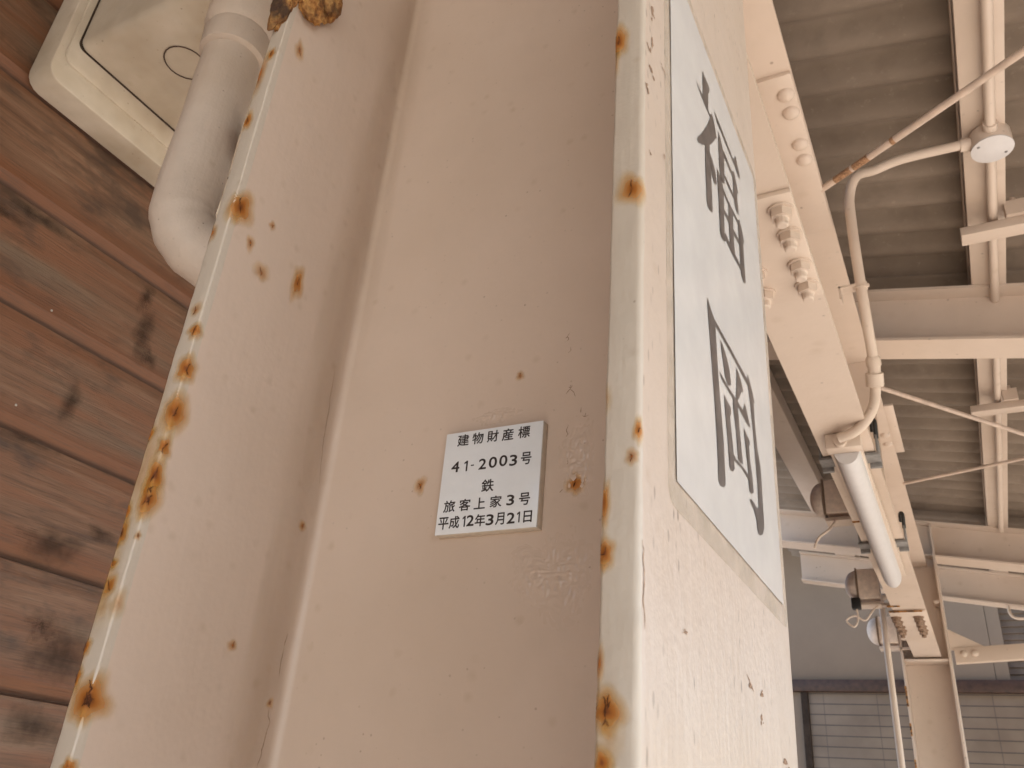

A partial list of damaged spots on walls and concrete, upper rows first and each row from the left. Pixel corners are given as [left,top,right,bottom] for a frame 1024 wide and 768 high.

corrosion [615,29,626,53]
corrosion [622,178,643,199]
corrosion [229,196,250,220]
corrosion [293,273,302,292]
corrosion [177,357,194,379]
corrosion [118,396,185,544]
corrosion [569,477,582,491]
corrosion [600,540,612,566]
corrosion [73,670,106,719]
corrosion [596,693,620,728]